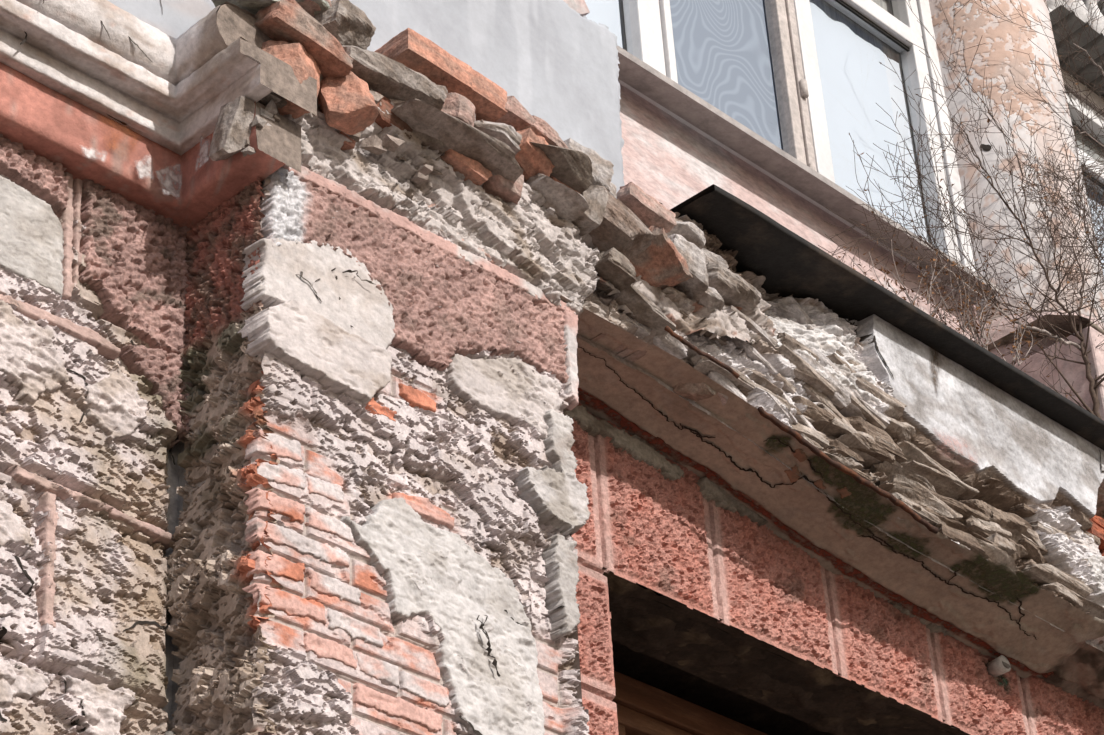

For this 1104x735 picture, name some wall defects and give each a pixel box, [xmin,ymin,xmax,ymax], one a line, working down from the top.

peeling [0,491,34,561]
peeling [0,656,50,706]
peeling [0,134,193,451]
peeling [62,675,136,735]
peeling [242,429,545,735]
peeling [237,105,1104,678]
crack [579,347,1036,639]
crack [829,307,894,379]